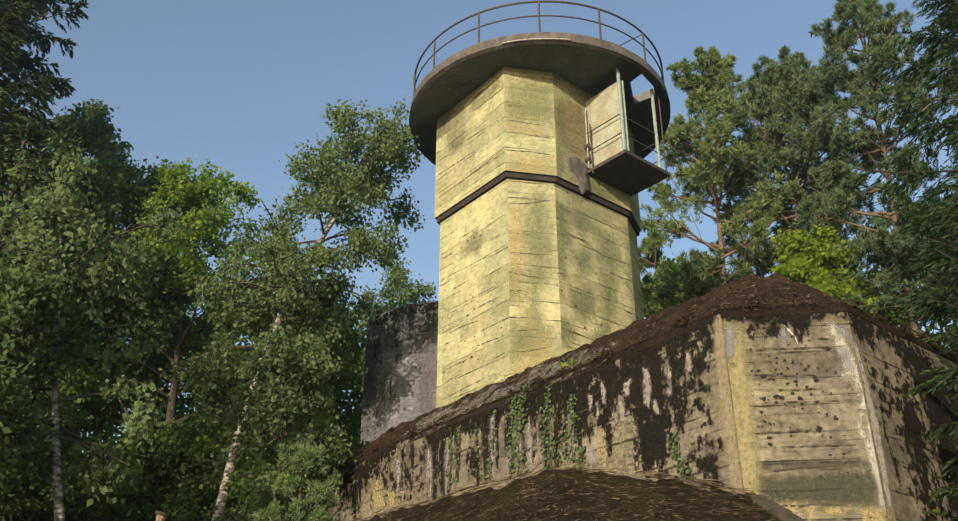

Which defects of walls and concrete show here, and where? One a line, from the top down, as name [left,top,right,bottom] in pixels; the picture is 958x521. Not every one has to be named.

damp [336,303,958,521]